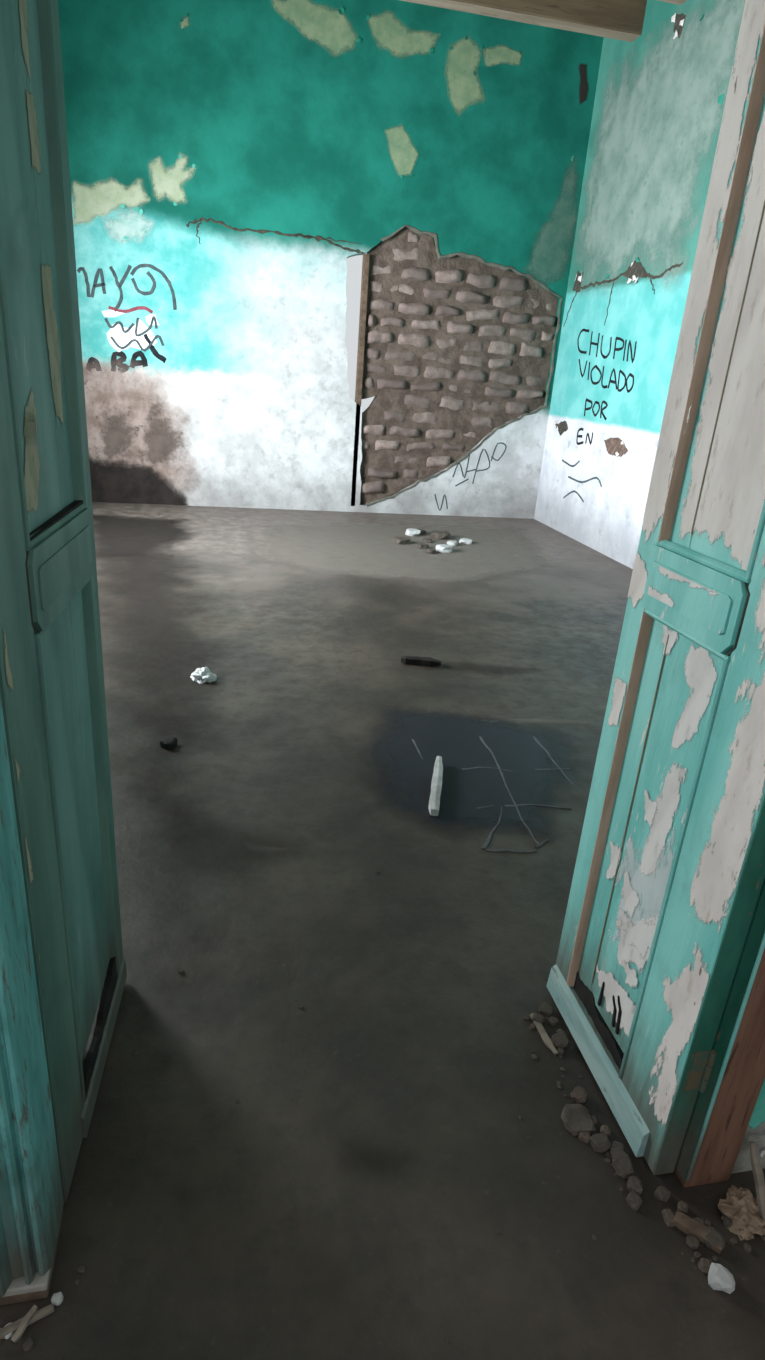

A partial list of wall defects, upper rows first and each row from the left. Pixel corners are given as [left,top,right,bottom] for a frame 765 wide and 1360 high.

peeling [273,0,522,113]
water stain [579,64,588,104]
peeling [73,155,196,224]
crack [186,217,363,255]
crack [564,262,683,326]
water stain [83,367,193,483]
spalling [360,0,765,933]
peeling [596,625,718,1036]
peeling [649,944,709,1127]